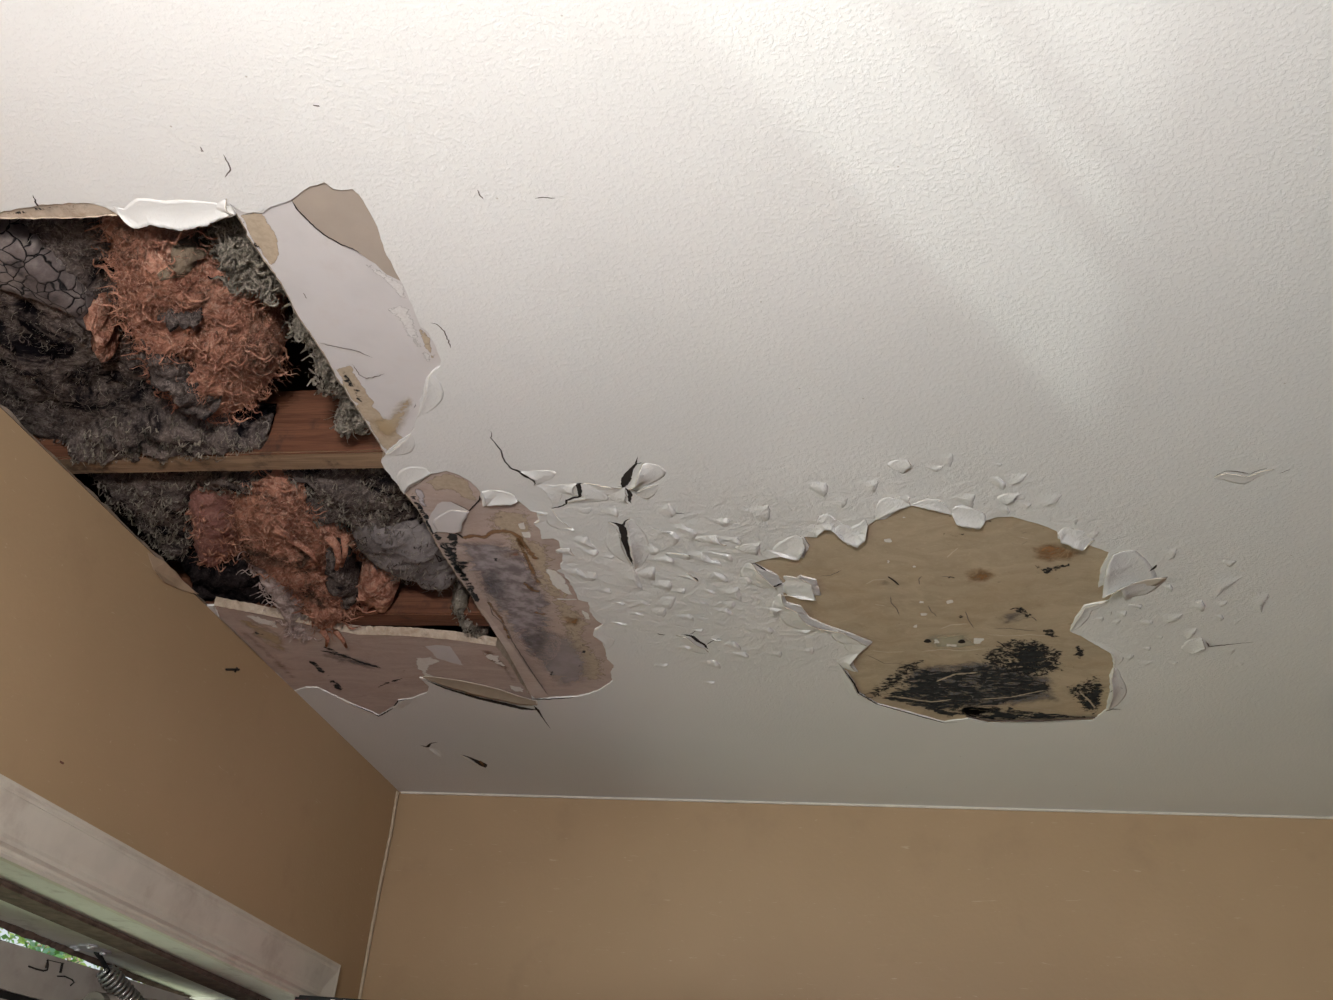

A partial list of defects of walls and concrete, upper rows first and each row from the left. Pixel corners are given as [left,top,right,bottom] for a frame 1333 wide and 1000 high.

crack [490,432,684,569]
peeling [215,182,1167,728]
peeling [148,553,198,594]